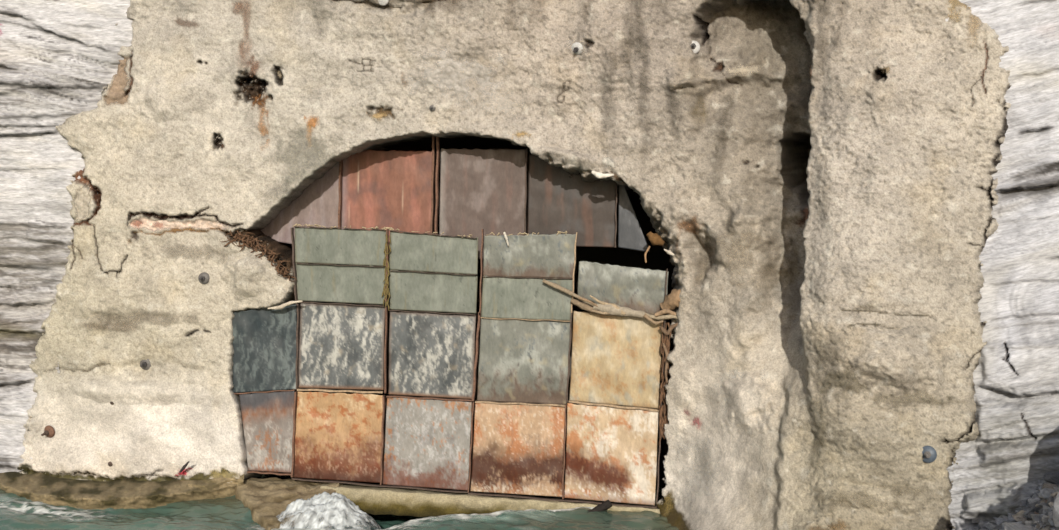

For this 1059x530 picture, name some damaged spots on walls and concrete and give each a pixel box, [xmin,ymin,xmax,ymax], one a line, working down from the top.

spalling [101,53,133,104]
spalling [237,66,283,107]
crack [127,208,242,227]
crack [71,226,128,276]